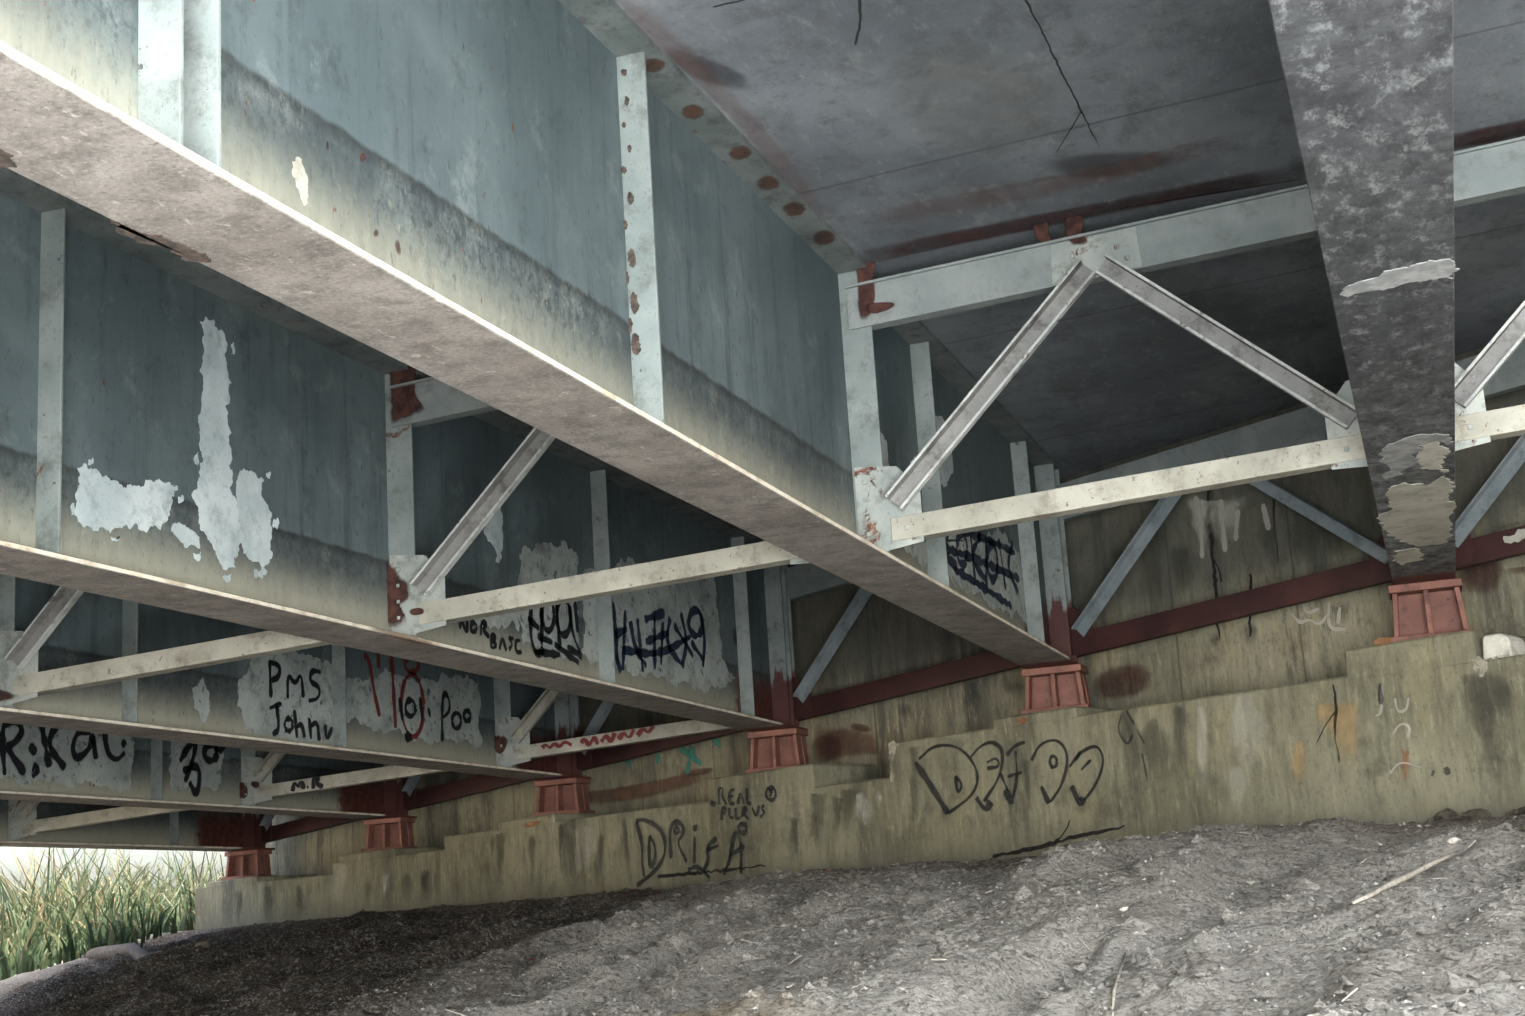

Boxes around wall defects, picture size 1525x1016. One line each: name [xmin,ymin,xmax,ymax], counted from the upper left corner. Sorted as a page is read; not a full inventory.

crack [713,0,744,8]
crack [854,0,862,45]
crack [1024,0,1099,151]
corrosion [892,179,1255,256]
corrosion [856,262,894,318]
peeling [1340,259,1460,297]
corrosion [390,365,423,422]
peeling [70,317,279,583]
peeling [1376,433,1457,565]
peeling [1503,529,1525,544]